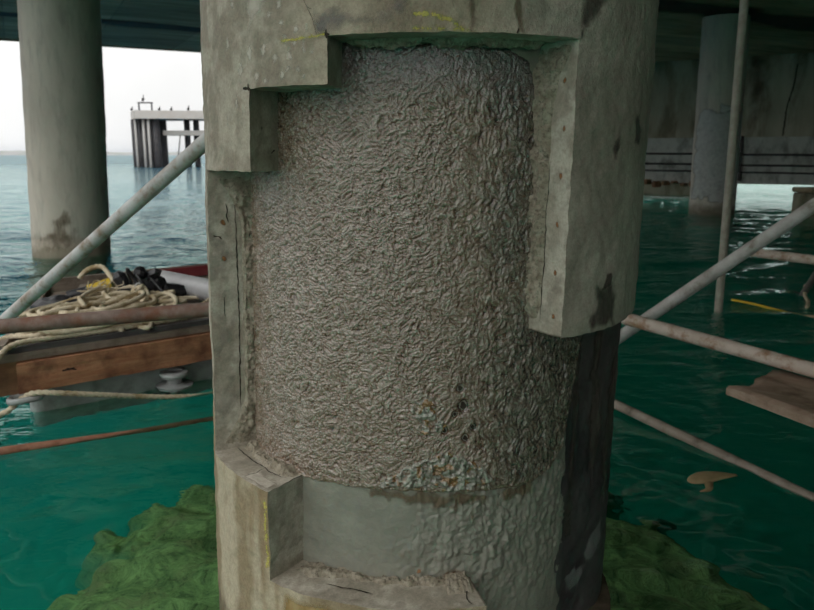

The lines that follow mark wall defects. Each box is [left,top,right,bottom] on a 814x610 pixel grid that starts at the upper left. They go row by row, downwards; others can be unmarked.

leakage [582,0,604,34]
crack [782,64,799,136]
spalling [246,42,581,493]
leakage [589,274,617,496]
spalling [296,562,474,595]